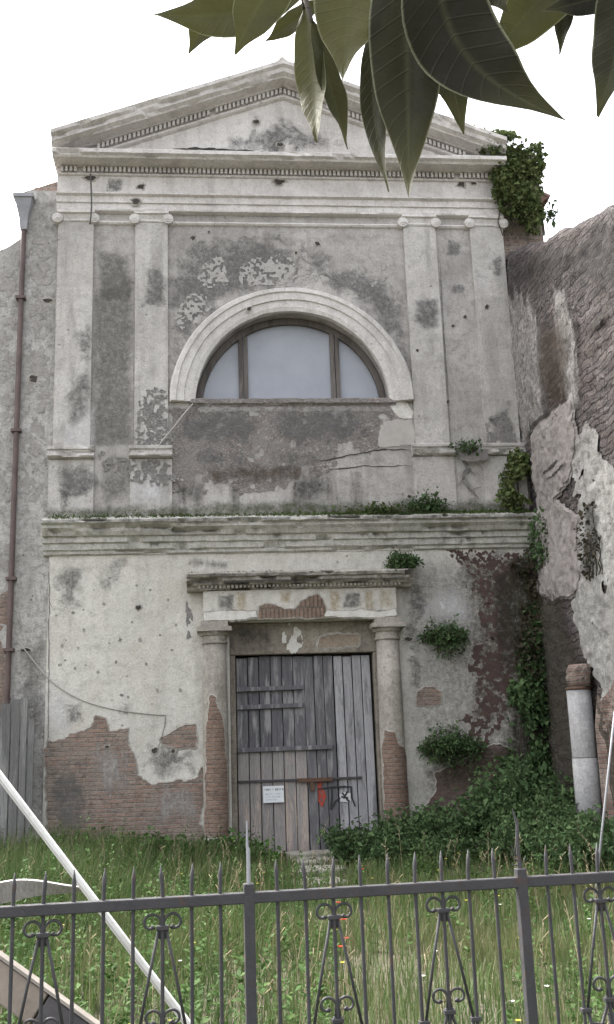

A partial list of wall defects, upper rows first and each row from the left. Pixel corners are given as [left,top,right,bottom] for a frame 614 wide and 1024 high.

spalling [42,694,229,849]